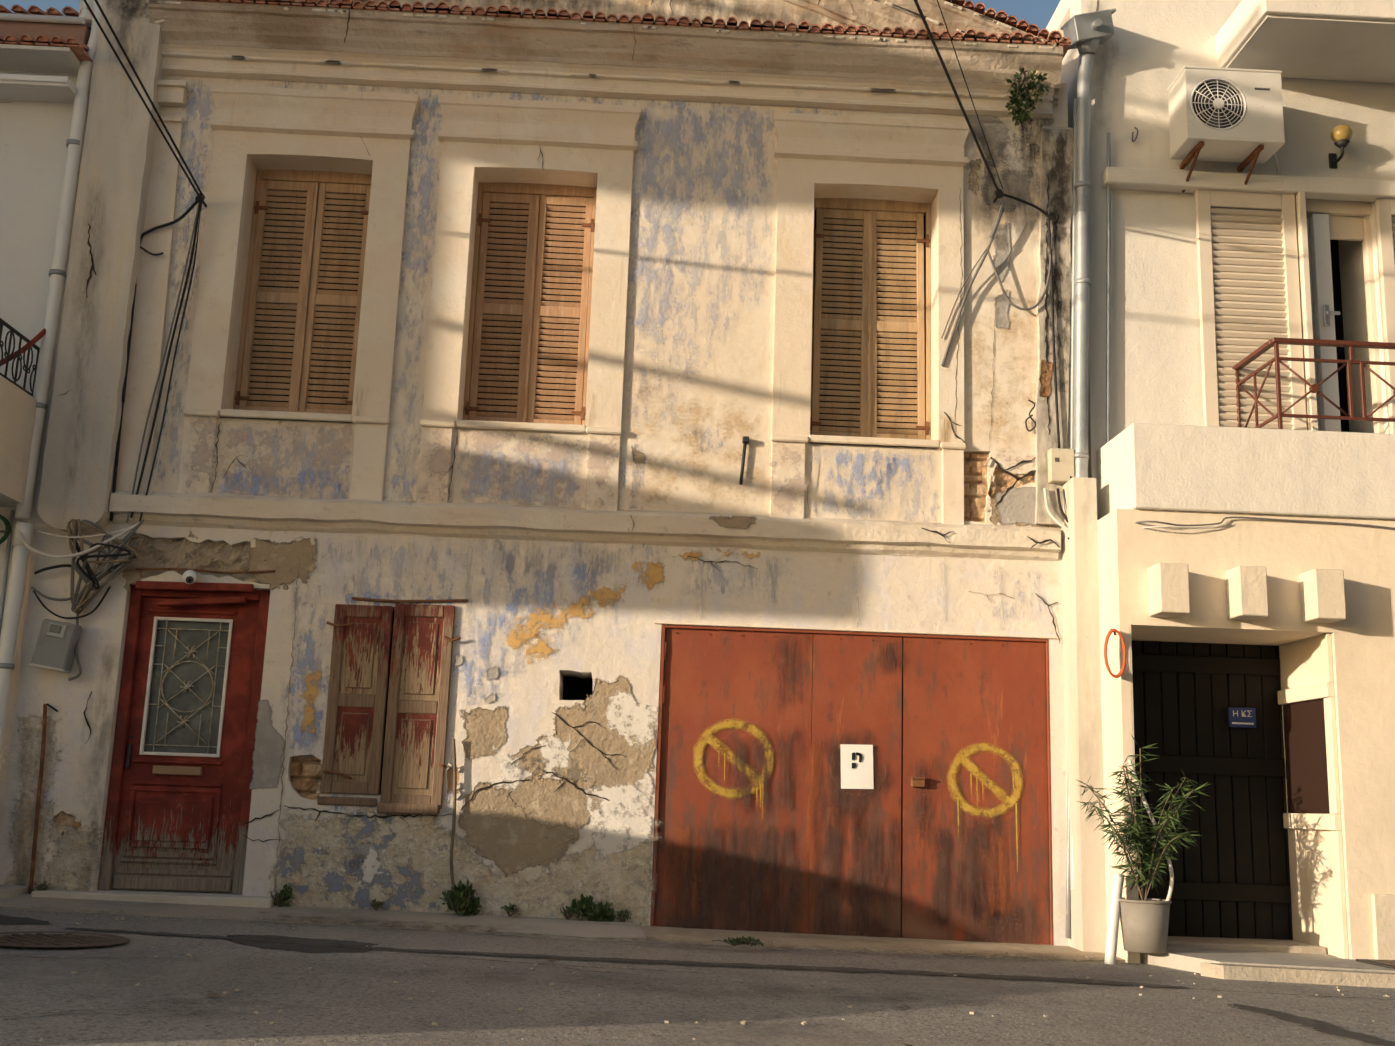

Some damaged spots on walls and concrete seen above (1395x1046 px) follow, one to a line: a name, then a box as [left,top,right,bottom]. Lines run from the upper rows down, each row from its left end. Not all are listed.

peeling [633,101,770,393]
peeling [392,432,645,506]
flaking render [709,516,757,529]
peeling [770,452,806,510]
peeling [823,453,934,517]
flaking render [964,452,1062,529]
flaking render [117,531,337,606]
peeling [249,541,664,926]
peeling [6,716,100,891]
peeling [818,737,899,937]